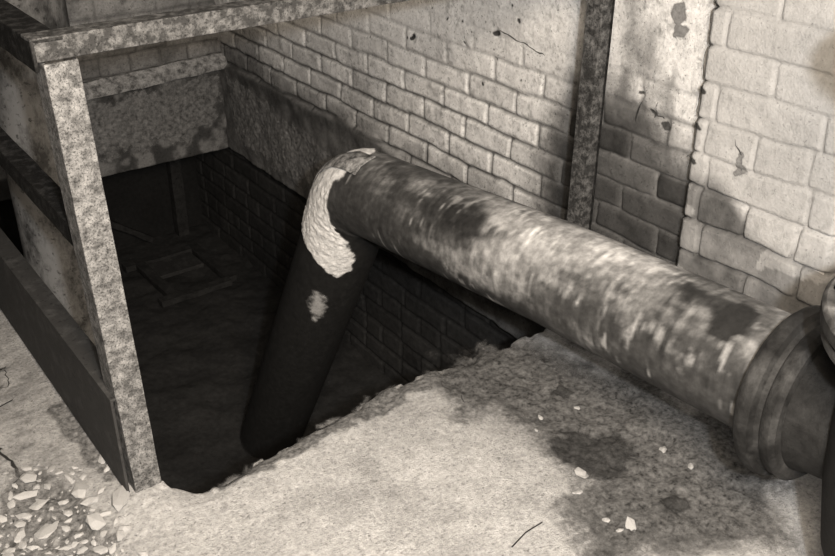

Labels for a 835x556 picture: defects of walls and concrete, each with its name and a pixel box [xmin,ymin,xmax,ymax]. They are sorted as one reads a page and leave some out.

peeling [671,2,689,37]
crack [675,0,720,265]
crack [0,448,27,492]